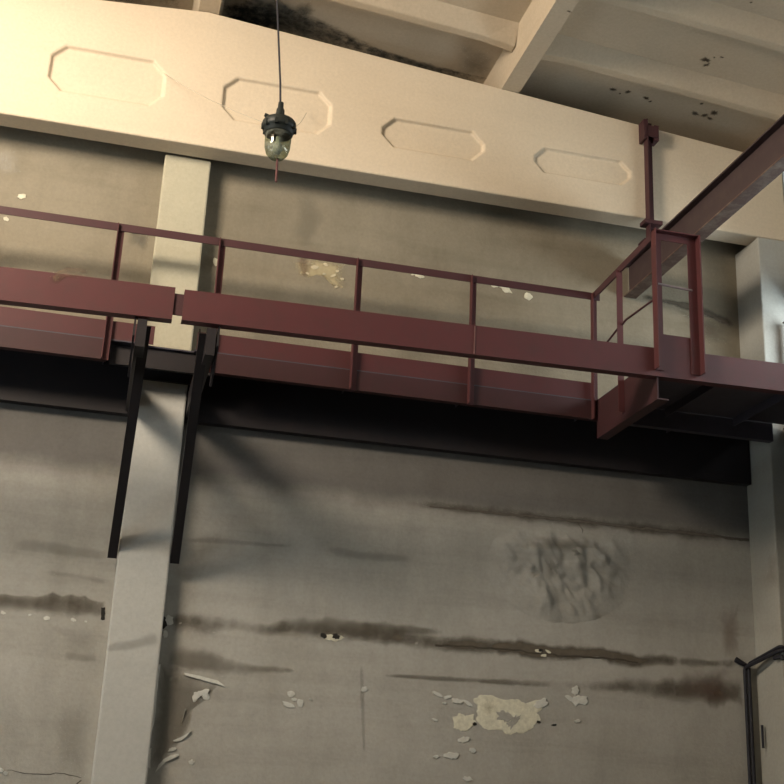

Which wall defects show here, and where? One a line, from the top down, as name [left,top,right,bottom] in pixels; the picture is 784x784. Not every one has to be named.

water stain [229,0,459,75]
peeling [301,262,344,288]
water stain [0,593,94,622]
water stain [314,626,674,666]
peeling [184,673,225,702]
peeling [565,685,588,706]
water stain [612,681,738,702]
peeling [432,691,548,753]
peeling [148,731,191,772]
crack [12,770,82,784]